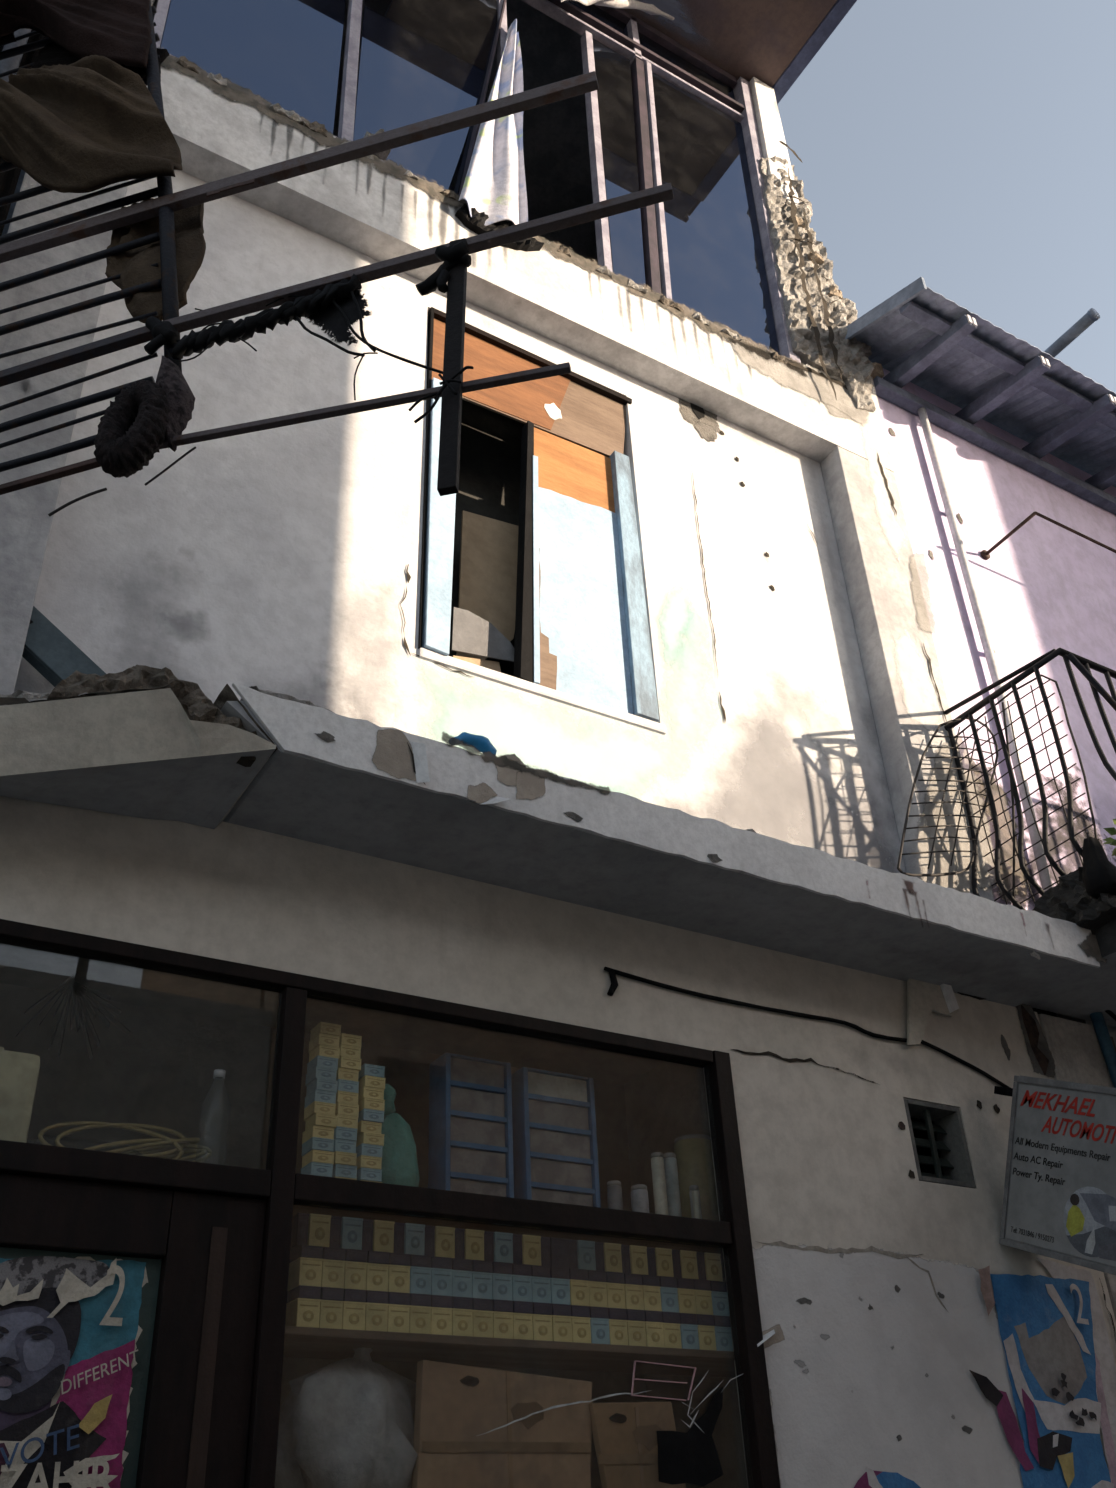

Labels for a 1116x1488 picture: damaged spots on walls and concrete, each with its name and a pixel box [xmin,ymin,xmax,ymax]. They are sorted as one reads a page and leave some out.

spalling [158,47,351,147]
spalling [356,154,467,208]
spalling [533,141,940,729]
spalling [47,665,278,767]
peeling [372,729,610,804]
water stain [711,719,897,873]
peeling [918,738,1029,908]
crack [731,1049,878,1084]